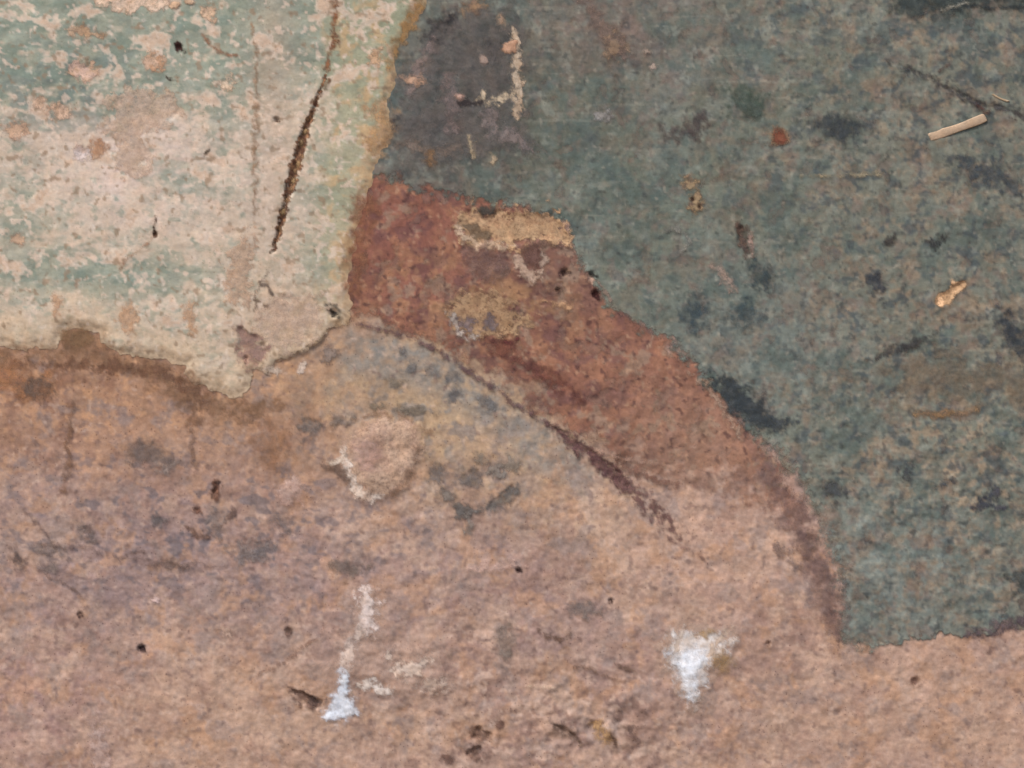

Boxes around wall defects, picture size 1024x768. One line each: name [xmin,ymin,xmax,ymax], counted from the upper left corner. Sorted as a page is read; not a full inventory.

peeling [94,0,217,24]
peeling [68,60,99,83]
peeling [143,41,183,81]
peeling [74,138,110,161]
crack [272,0,340,251]
flaking render [452,200,574,286]
flaking render [443,288,534,345]
flaking render [235,325,281,375]
water stain [322,585,391,720]
water stain [385,651,450,694]
water stain [659,625,737,710]